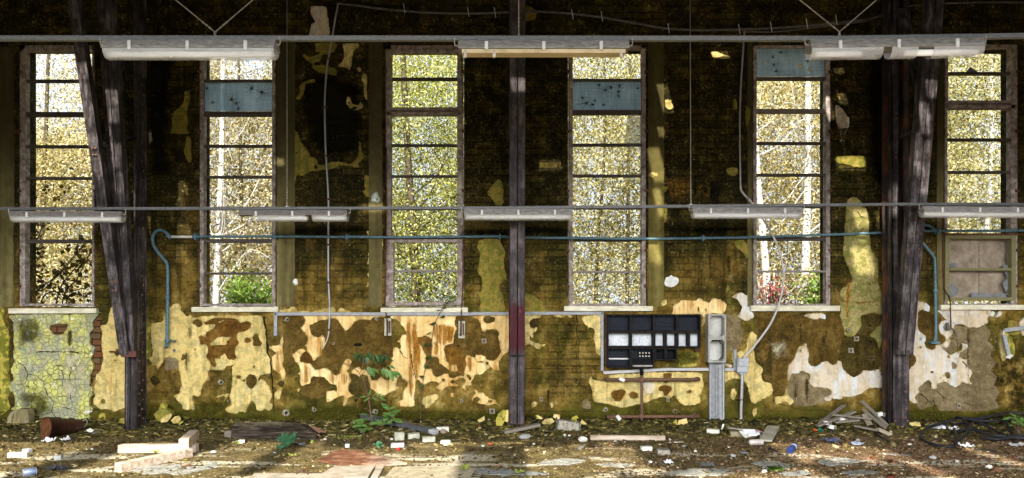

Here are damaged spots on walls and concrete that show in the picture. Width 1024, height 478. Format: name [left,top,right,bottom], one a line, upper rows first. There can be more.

peeling [296,6,367,110]
peeling [294,130,369,197]
crack [9,312,102,419]
peeling [91,307,125,419]
peeling [146,238,509,419]
peeling [589,352,704,408]
spalling [661,197,882,407]
flaking render [909,300,1002,411]